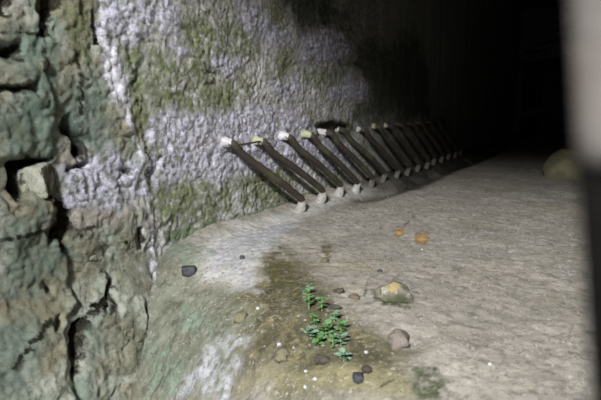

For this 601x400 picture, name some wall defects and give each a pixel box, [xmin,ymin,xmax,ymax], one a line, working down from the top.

crack [70,244,121,332]